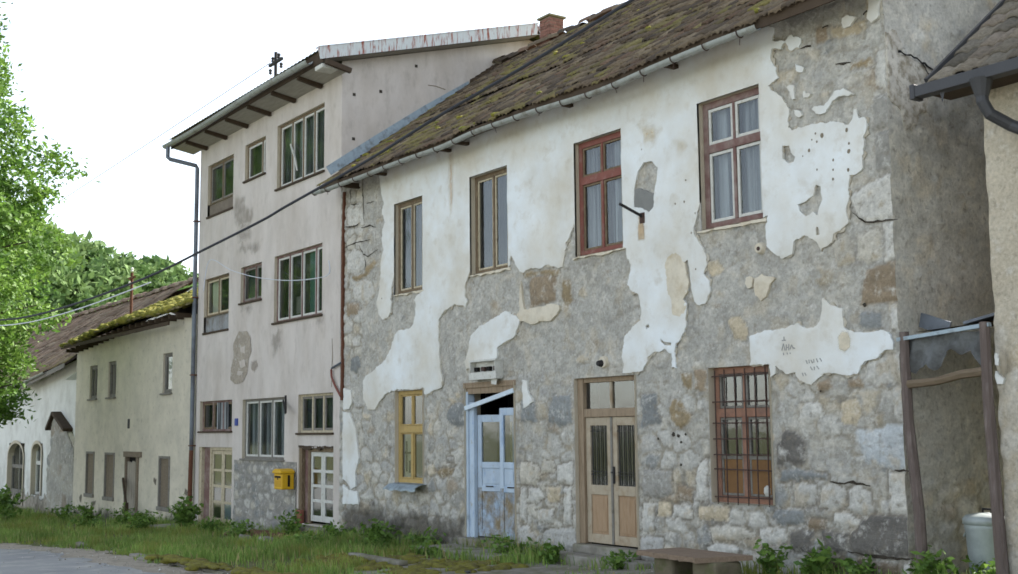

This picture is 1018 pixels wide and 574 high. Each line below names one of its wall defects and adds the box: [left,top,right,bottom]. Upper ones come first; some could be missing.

spalling [339,0,930,574]
spalling [230,331,251,384]
crack [830,479,870,487]